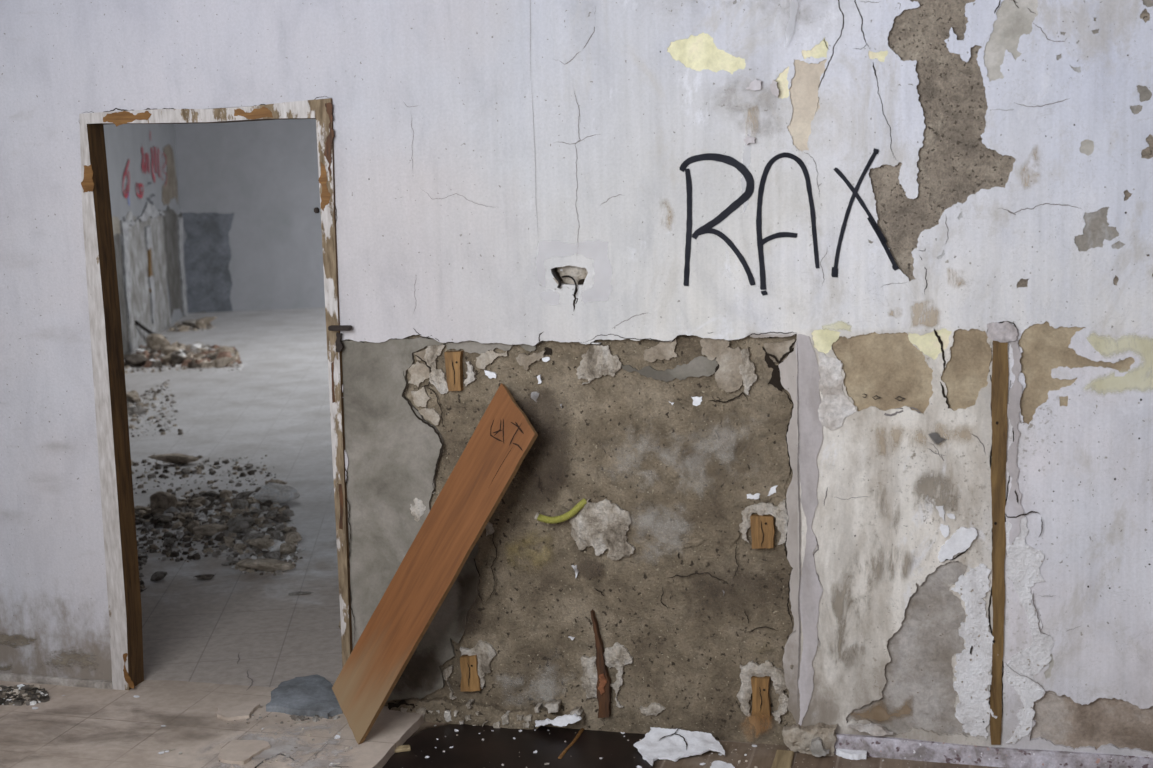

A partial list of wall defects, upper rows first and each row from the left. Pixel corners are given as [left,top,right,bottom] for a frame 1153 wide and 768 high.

crack [526,0,534,72]
crack [532,11,621,253]
flaking render [746,37,828,151]
crack [815,0,901,159]
flaking render [868,0,1038,281]
spalling [552,266,588,295]
crack [580,313,678,343]
flaking render [811,322,992,430]
flaking render [1018,321,1153,424]
flaking render [339,334,797,745]
flaking render [846,506,1153,752]
crack [255,743,347,768]